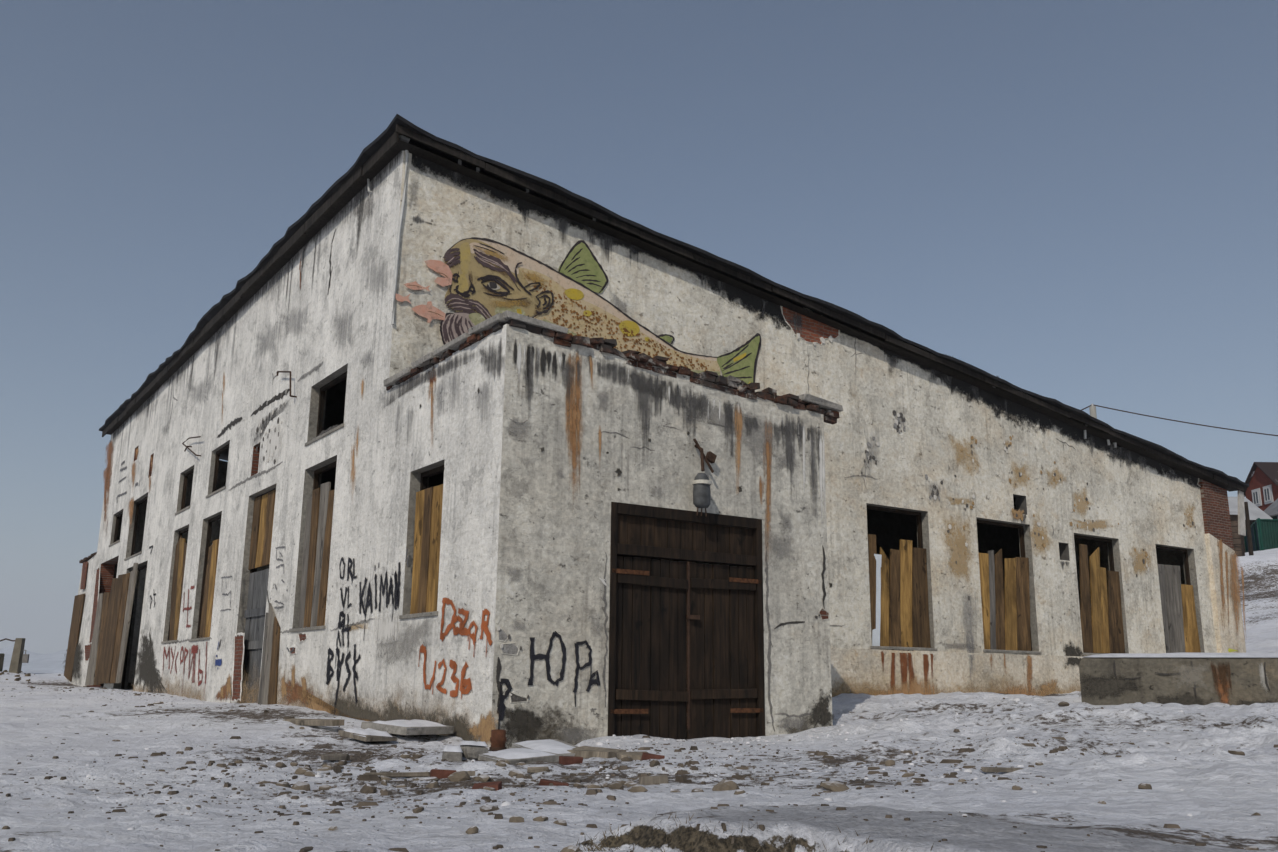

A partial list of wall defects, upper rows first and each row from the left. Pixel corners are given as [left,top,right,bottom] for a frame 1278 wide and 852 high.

leakage [357,190,369,247]
leakage [286,238,317,297]
spalling [780,306,840,347]
leakage [389,338,758,451]
rust [566,355,593,486]
rust [759,421,772,546]
leakage [774,416,825,512]
peeling [925,436,980,577]
rust [1218,540,1246,637]
rust [881,649,935,695]